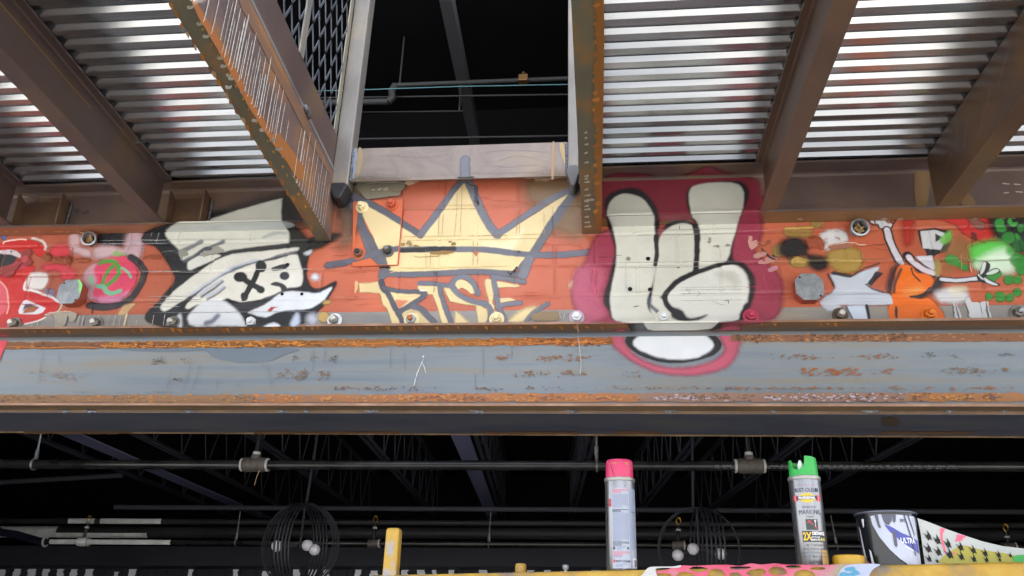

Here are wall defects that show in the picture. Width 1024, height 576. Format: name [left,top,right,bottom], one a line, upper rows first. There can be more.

rust [169,1,307,220]
rust [591,0,604,234]
rust [0,323,1024,403]